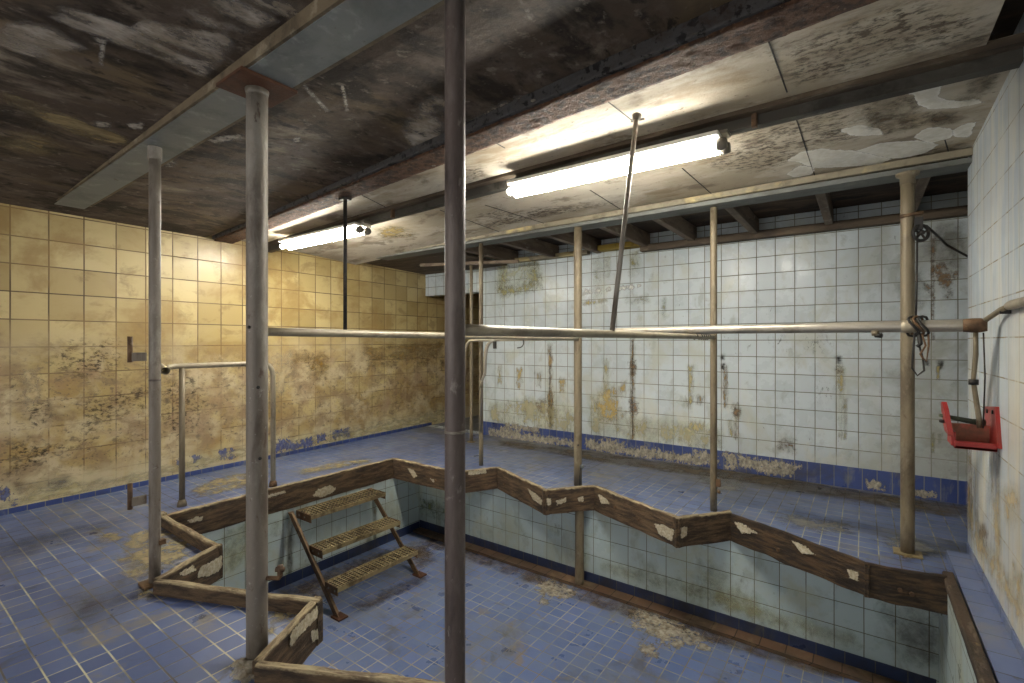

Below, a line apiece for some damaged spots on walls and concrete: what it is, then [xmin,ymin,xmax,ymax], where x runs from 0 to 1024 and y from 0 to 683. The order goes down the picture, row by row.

mould [793,6,979,81]
water stain [40,113,126,144]
water stain [715,75,997,177]
mould [86,390,143,430]